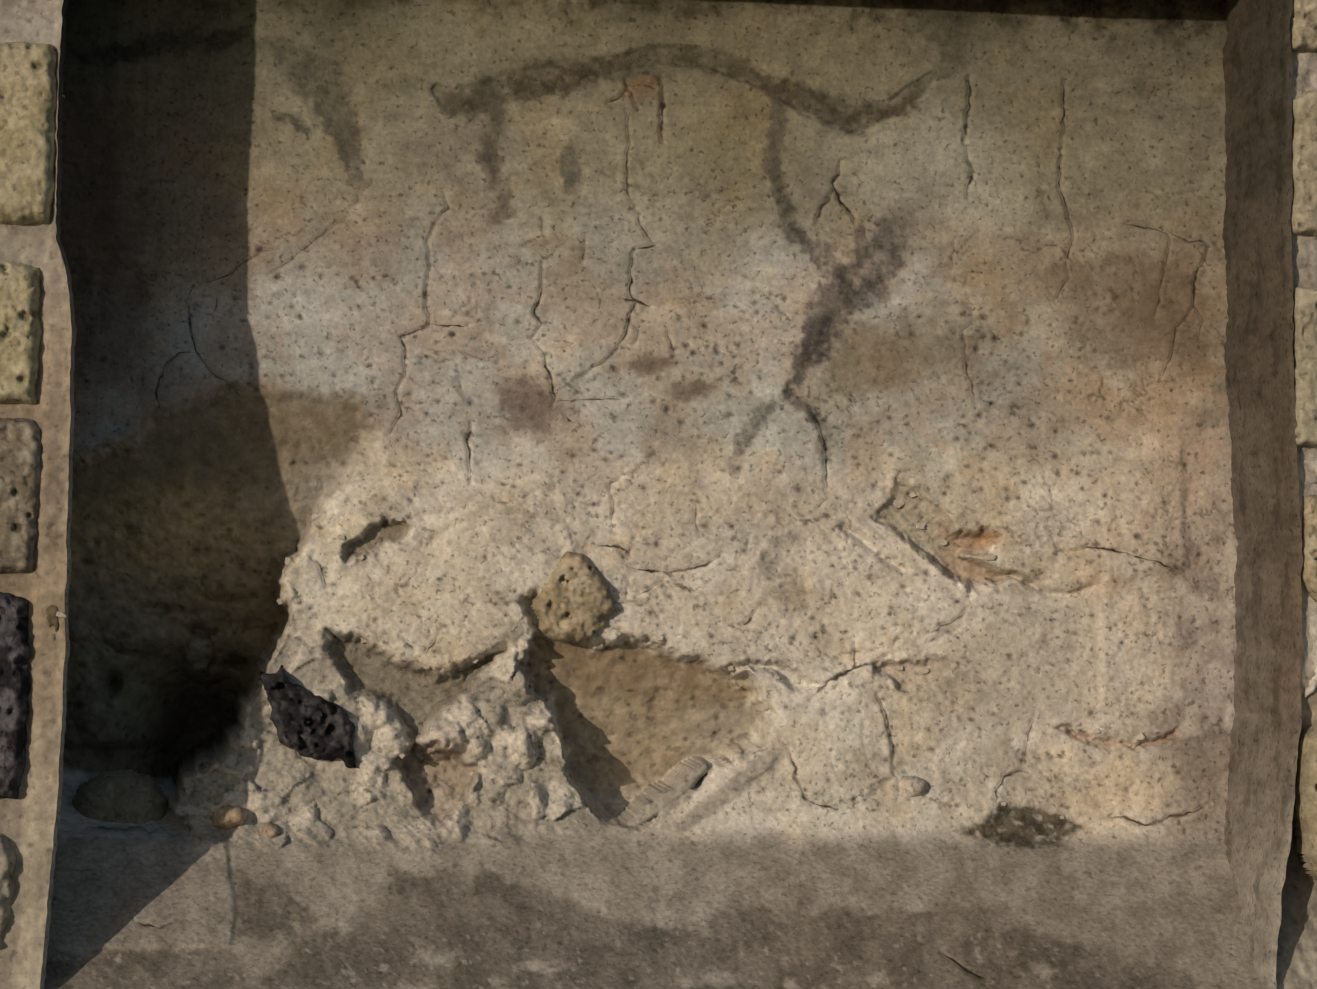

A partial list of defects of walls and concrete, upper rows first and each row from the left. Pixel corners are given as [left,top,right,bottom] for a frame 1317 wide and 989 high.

damp [278,55,363,177]
crack [598,84,665,365]
crack [818,164,853,217]
crack [395,250,462,424]
crack [533,270,611,422]
damp [782,220,905,408]
crack [810,412,827,507]
spalling [868,470,1022,595]
spalling [320,626,779,833]
spalling [869,651,973,696]
spalling [1053,720,1183,755]
spalling [955,794,1079,851]